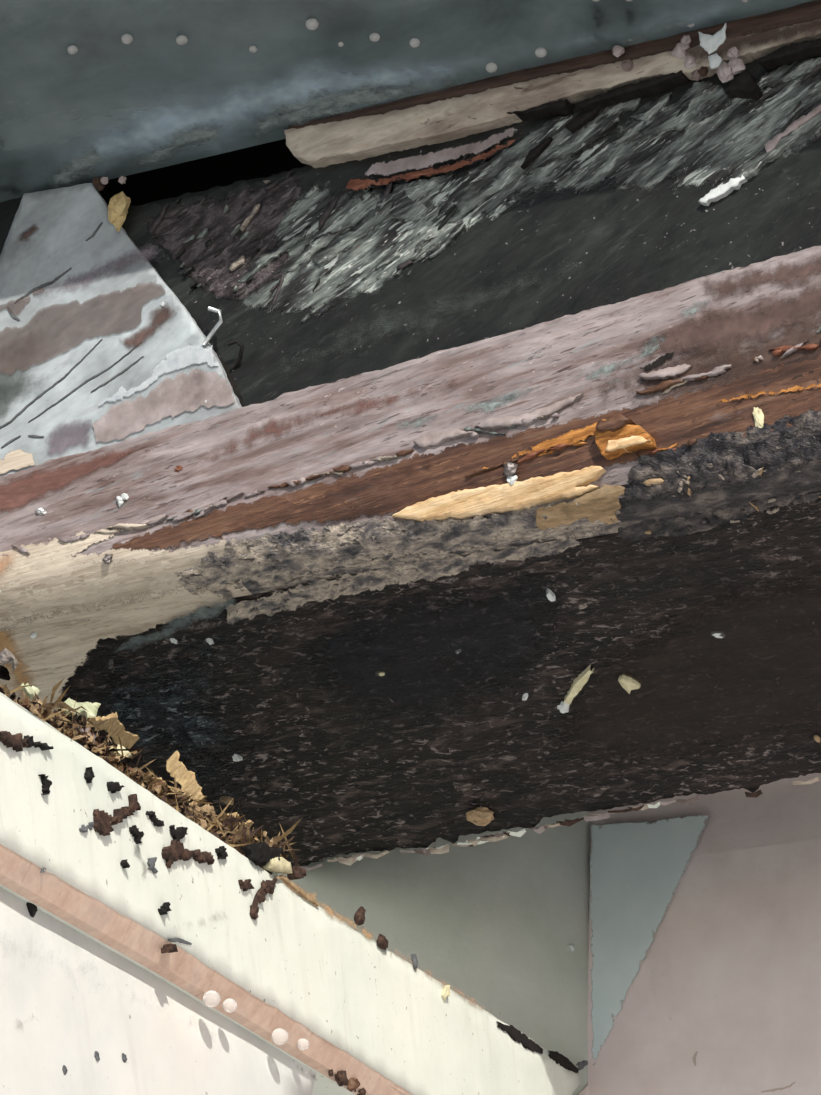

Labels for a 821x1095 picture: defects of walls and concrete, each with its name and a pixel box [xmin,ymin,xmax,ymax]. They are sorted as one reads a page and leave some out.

peeling [97,23,821,322]
peeling [0,282,166,375]
peeling [93,345,235,442]
peeling [636,363,732,395]
peeling [58,389,584,543]
peeling [624,409,821,501]
peeling [175,488,821,625]
water stain [100,654,232,766]
water stain [118,599,235,651]
water stain [315,580,557,713]
water stain [560,576,821,767]
crack [761,1082,796,1092]